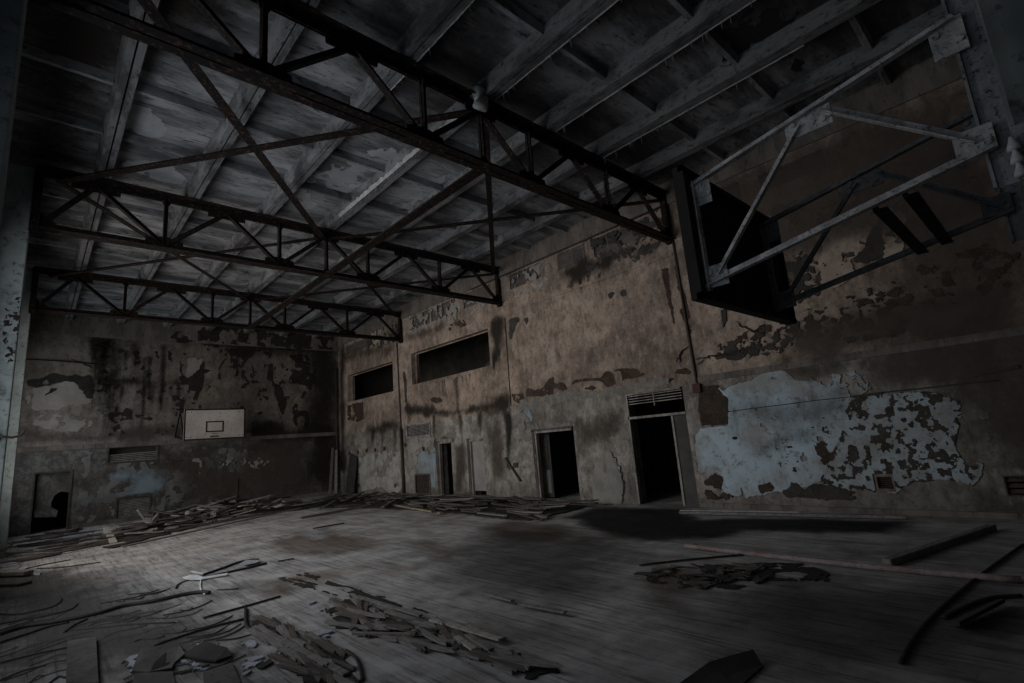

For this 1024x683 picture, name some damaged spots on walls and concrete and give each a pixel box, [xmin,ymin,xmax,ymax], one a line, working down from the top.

flaking render [585,209,663,272]
peeling [2,297,21,364]
peeling [707,232,1019,361]
peeling [25,348,314,436]
water stain [91,327,390,501]
peeling [512,368,645,444]
crack [610,451,625,503]
peeling [695,370,983,501]